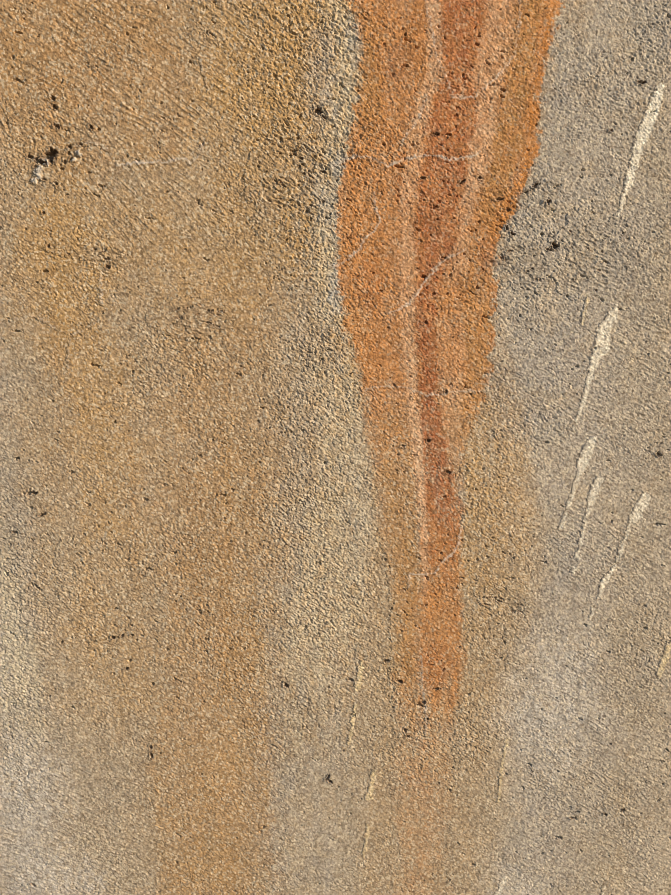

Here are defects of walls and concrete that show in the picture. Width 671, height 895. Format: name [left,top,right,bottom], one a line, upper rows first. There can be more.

corrosion [331,0,598,895]